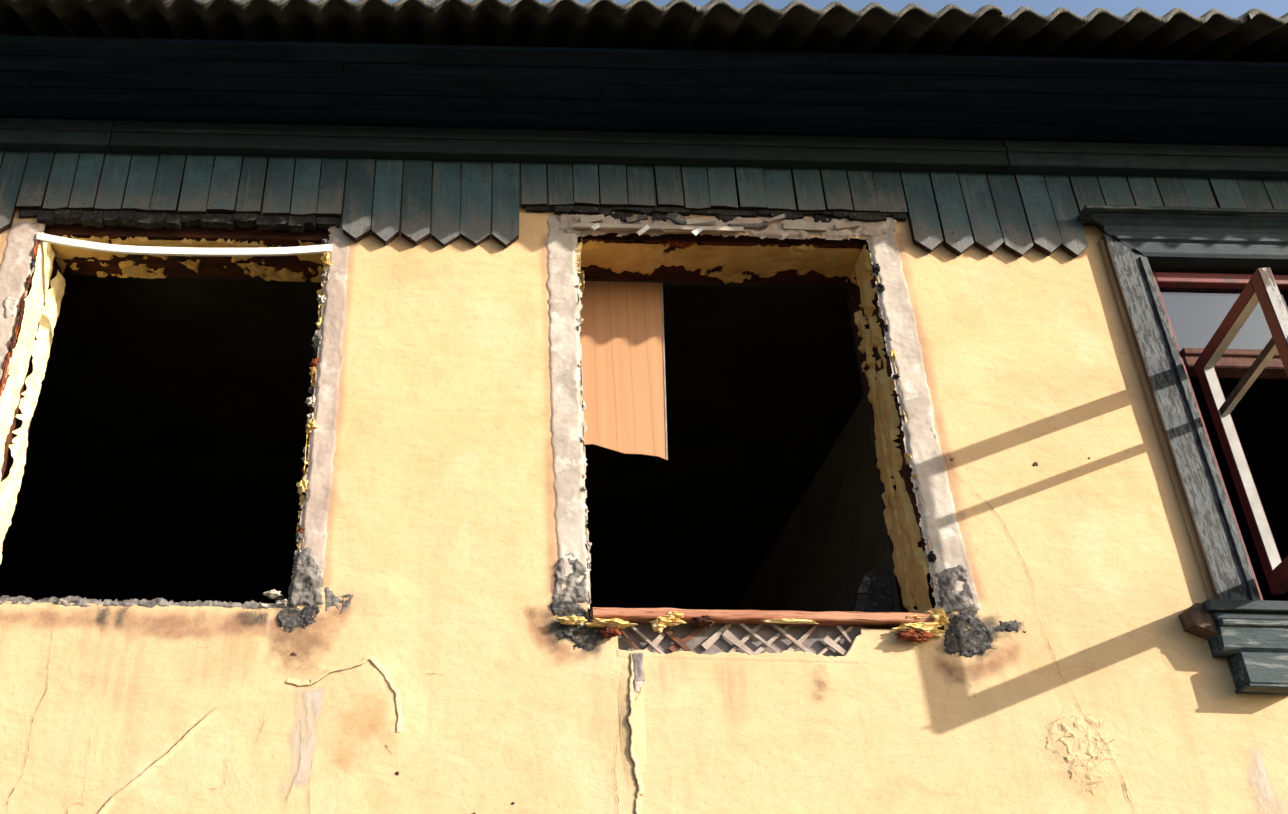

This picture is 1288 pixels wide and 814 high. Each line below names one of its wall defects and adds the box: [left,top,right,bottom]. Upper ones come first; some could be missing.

flaking render [0,220,46,405]
flaking render [545,211,981,610]
crack [286,721,312,814]
crack [286,654,403,754]
crack [614,649,645,814]
crack [931,429,1131,802]